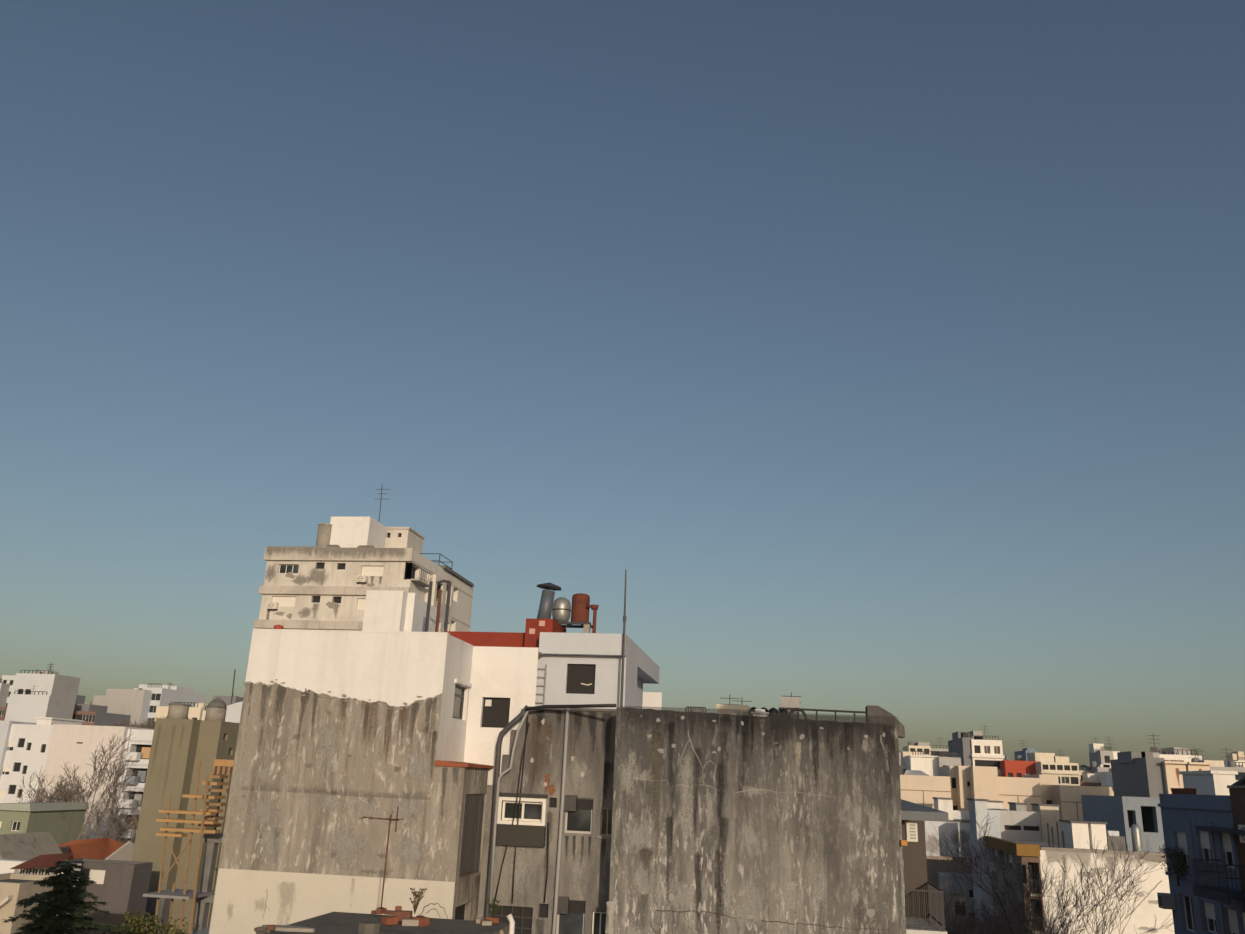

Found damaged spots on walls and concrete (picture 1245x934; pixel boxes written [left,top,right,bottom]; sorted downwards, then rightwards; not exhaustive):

peeling [243,679,440,715]
leakage [537,706,898,934]